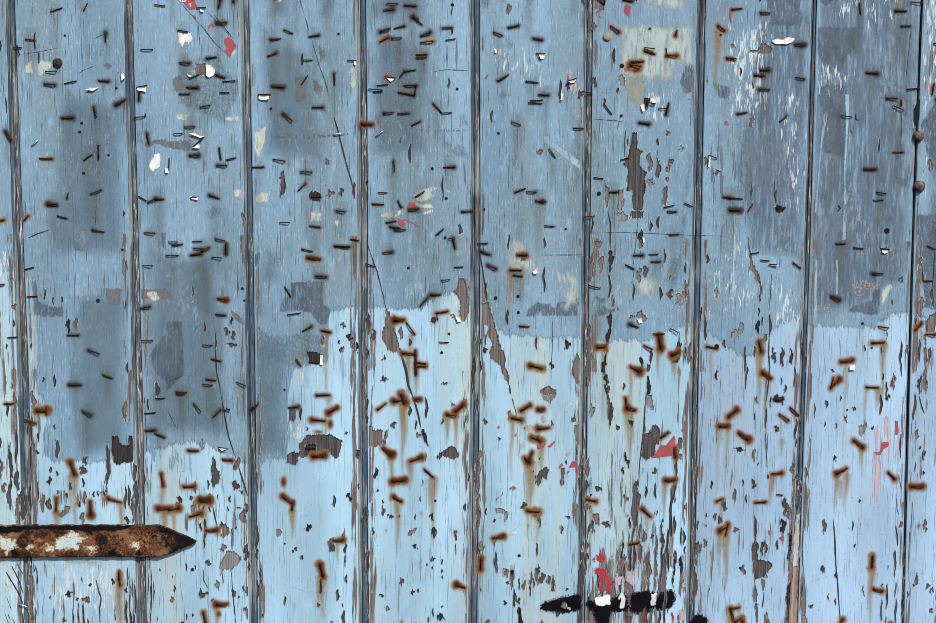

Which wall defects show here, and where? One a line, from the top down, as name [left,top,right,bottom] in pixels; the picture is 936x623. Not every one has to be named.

spalling [178,32,193,47]
spalling [149,153,160,171]
peeling [309,182,356,222]
peeling [0,229,272,623]
rust [308,393,341,433]
peeling [285,236,412,623]
rust [375,389,423,438]
rust [716,405,754,445]
peeling [852,190,936,623]
rust [154,471,221,534]
rust [380,445,437,531]
rust [522,424,551,526]